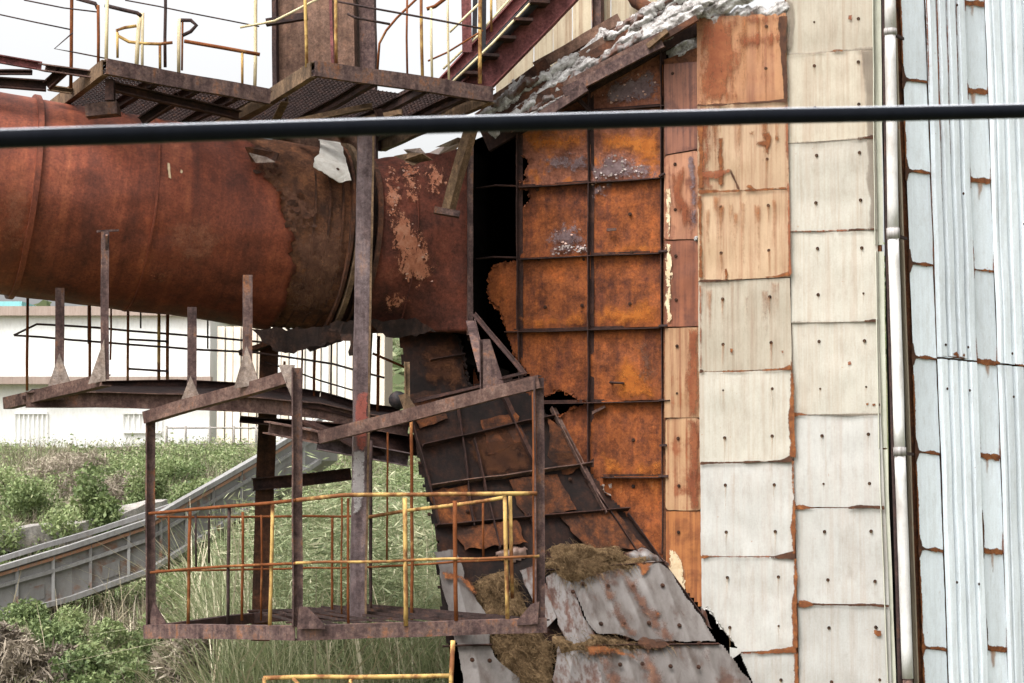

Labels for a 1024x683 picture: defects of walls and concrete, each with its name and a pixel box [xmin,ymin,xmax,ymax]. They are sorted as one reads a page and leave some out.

corrosion [697,15,788,110]
corrosion [900,0,988,105]
corrosion [253,160,317,232]
peeling [385,292,410,313]
peeling [385,162,447,287]
corrosion [909,247,934,273]
corrosion [904,121,942,229]
corrosion [970,169,991,193]
corrosion [601,124,889,683]
corrosion [912,343,1001,683]
corrosion [587,563,673,683]